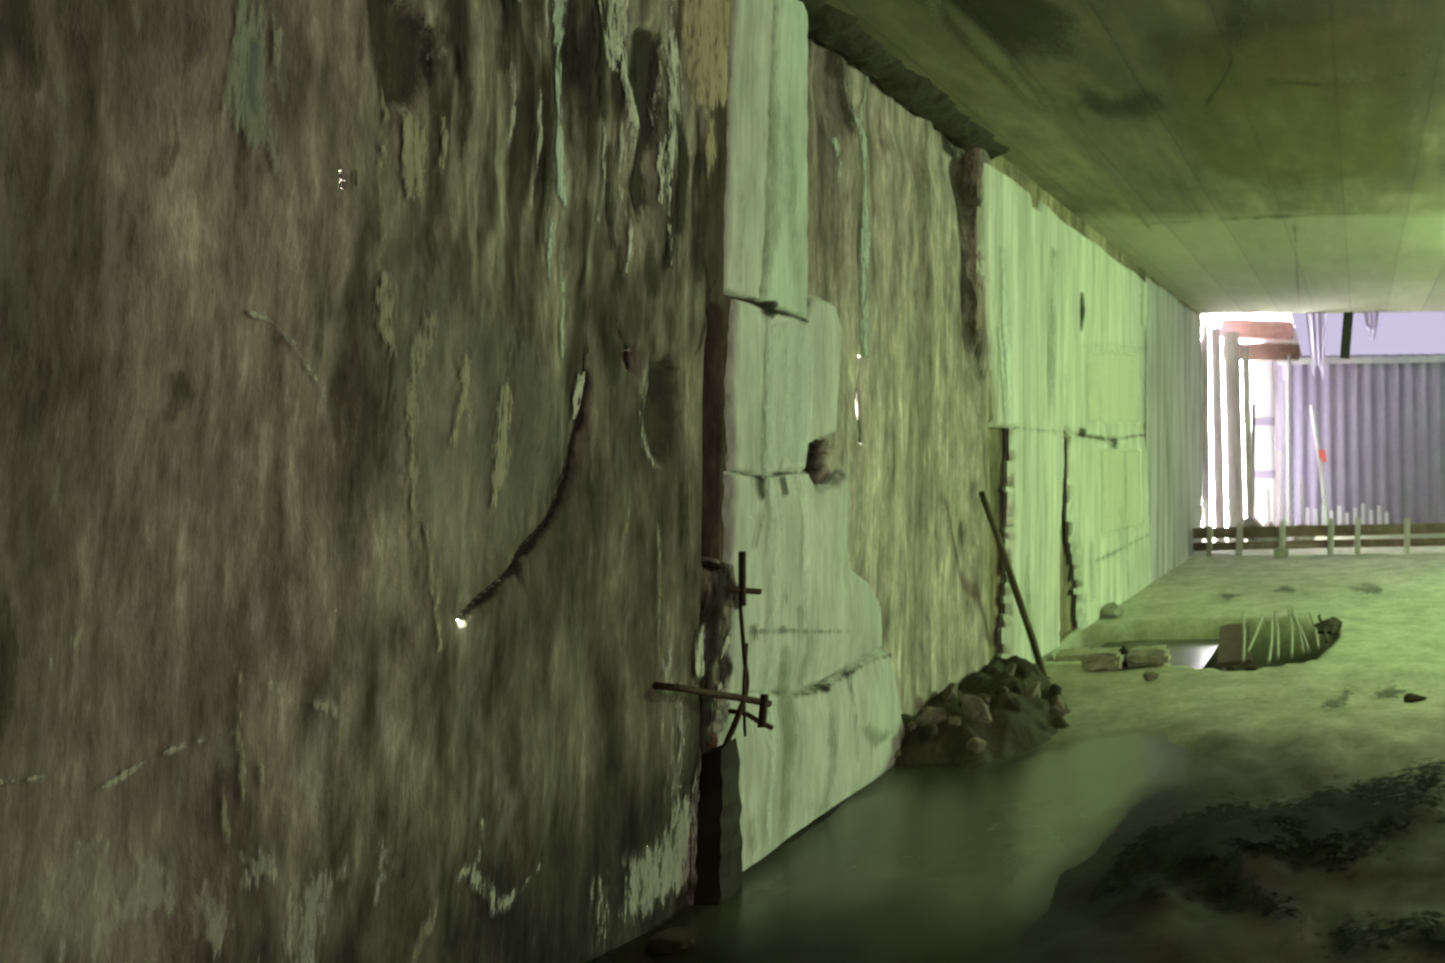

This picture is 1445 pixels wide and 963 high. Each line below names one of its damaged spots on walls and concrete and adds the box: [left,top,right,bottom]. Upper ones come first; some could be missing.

damp [916,0,1047,111]
damp [849,78,871,357]
spalling [941,131,986,378]
crack [456,299,591,620]
peeling [414,901,437,959]